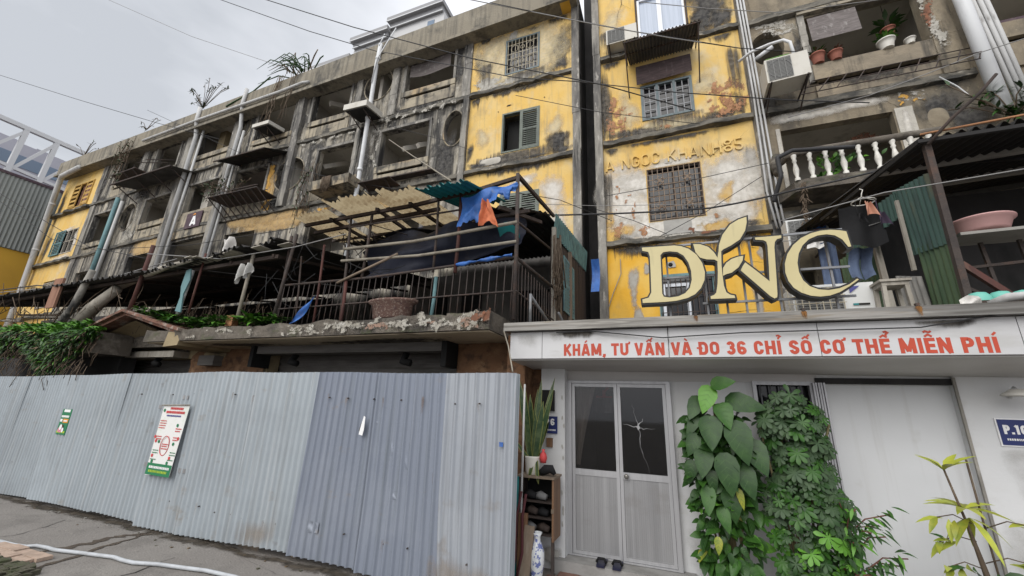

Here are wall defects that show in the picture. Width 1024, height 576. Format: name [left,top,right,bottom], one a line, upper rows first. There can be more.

flaking render [917,0,951,45]
peeling [693,75,749,117]
peeling [606,97,695,141]
damp [467,131,569,176]
peeling [281,309,491,336]